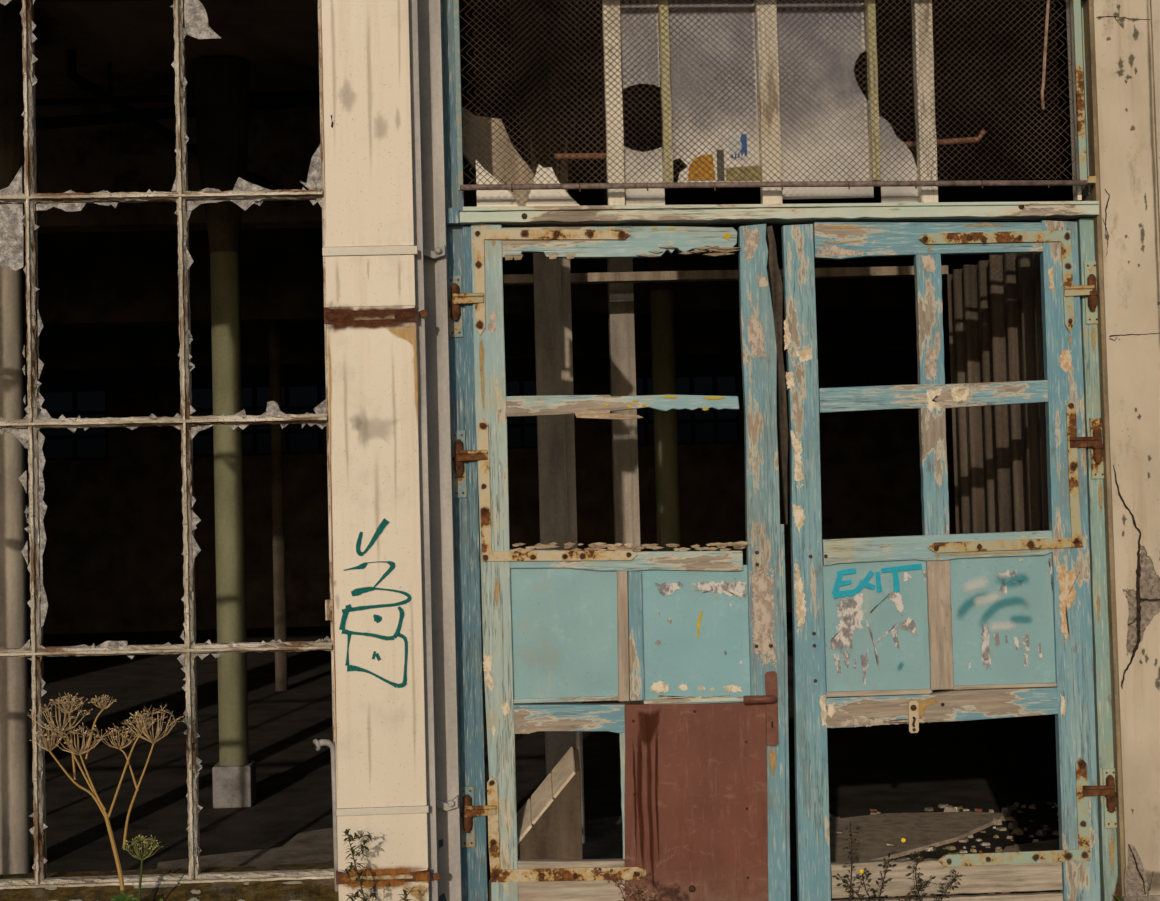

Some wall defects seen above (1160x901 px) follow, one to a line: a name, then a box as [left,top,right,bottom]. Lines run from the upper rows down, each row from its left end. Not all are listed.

peeling [723,227,761,262]
rust [325,307,418,410]
peeling [746,312,767,361]
peeling [655,565,777,670]
peeling [825,571,927,686]
peeling [969,620,1042,670]
peeling [1049,558,1080,647]
crack [1113,465,1160,689]
spalling [1122,546,1160,657]
rust [633,712,659,877]
rust [341,867,428,901]